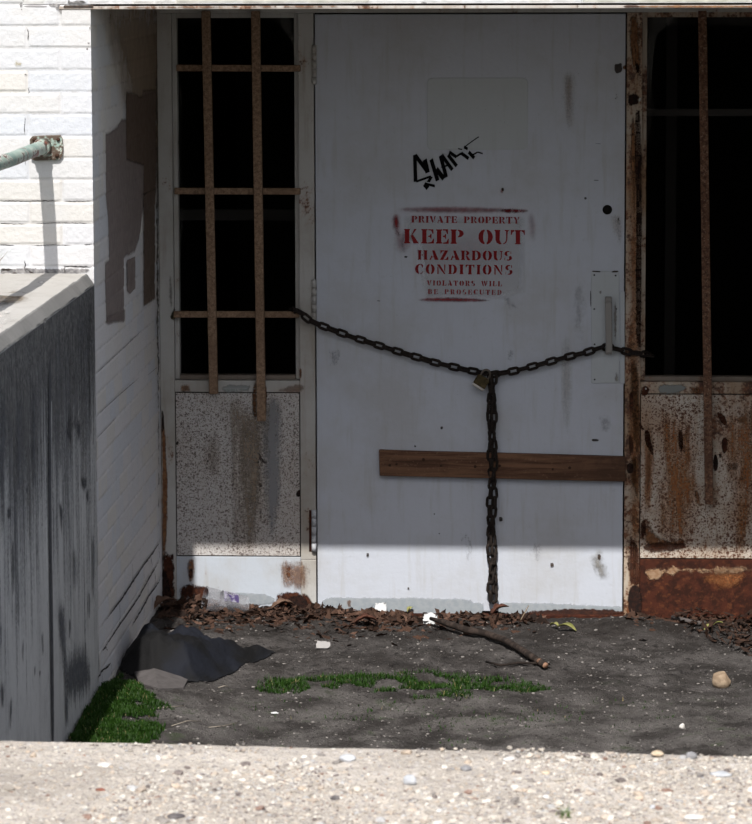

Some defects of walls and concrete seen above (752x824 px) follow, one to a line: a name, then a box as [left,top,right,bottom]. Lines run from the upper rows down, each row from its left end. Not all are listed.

water stain [0,286,95,619]
water stain [60,608,91,724]
corrosion [162,411,209,603]
corrosion [252,382,267,417]
corrosion [276,562,312,609]
corrosion [526,110,752,615]